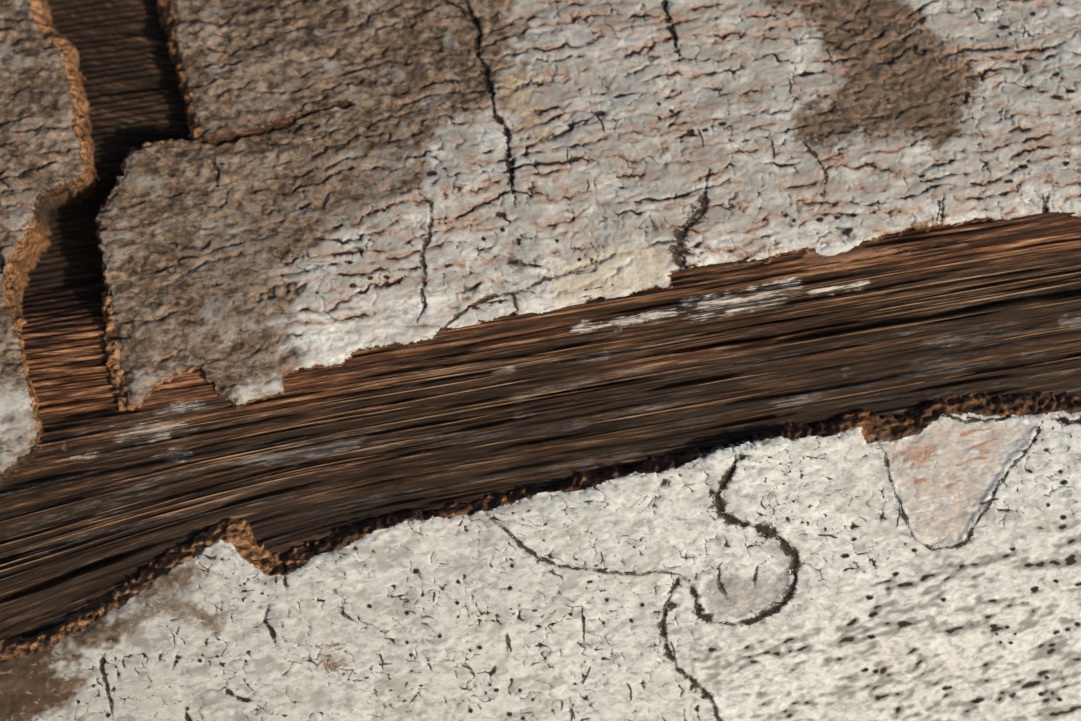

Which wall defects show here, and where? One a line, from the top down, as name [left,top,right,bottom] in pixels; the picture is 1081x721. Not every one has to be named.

crack [446,0,516,204]
crack [668,168,711,268]
crack [485,448,803,721]
crack [877,414,1081,551]